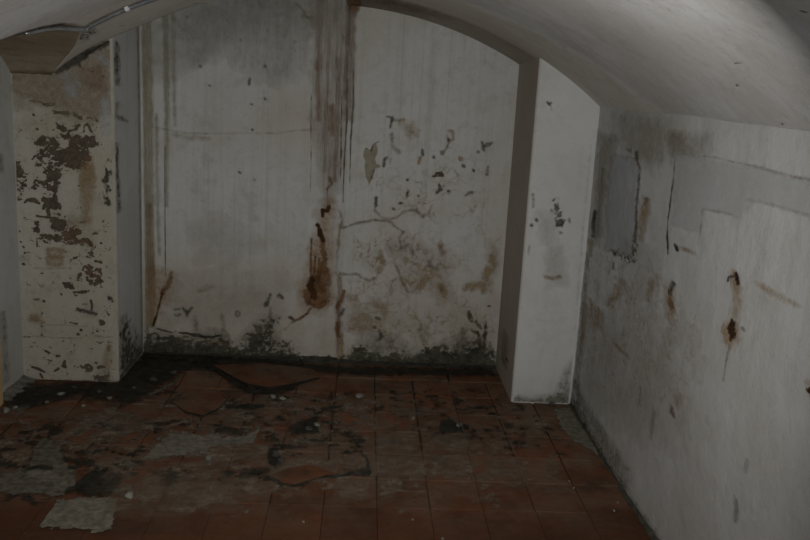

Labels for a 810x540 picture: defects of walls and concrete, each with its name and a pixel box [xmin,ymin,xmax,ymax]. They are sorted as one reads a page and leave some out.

peeling [15,100,114,381]
leakage [119,15,303,377]
rust [300,201,333,310]
spalling [363,141,387,184]
leakage [316,284,496,366]
rust [722,272,744,346]